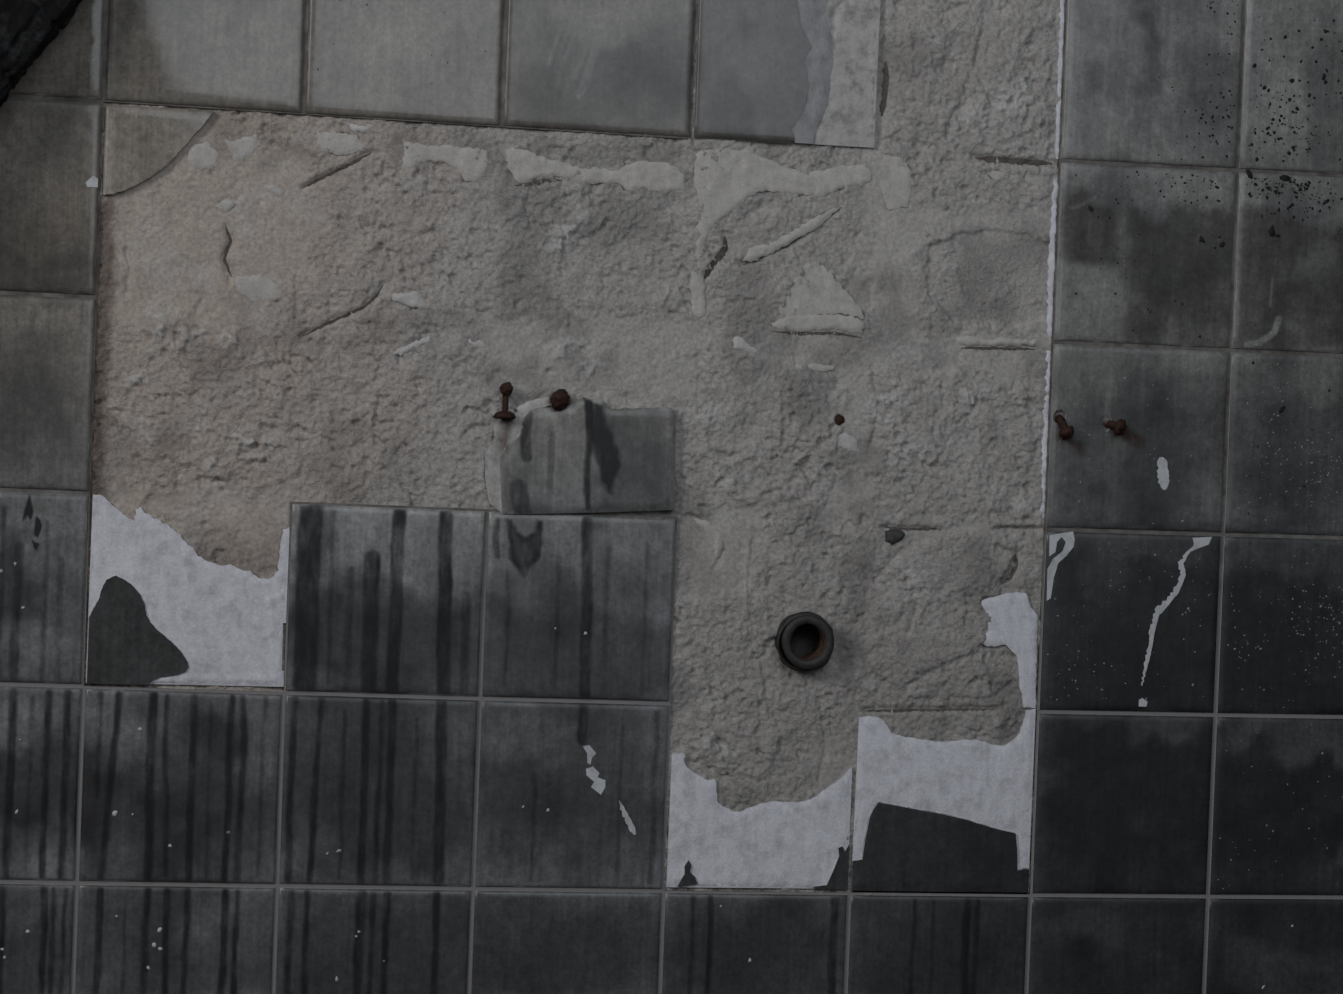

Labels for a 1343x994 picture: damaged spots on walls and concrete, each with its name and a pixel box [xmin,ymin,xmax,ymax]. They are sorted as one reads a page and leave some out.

damp [23,496,41,550]
damp [39,761,67,994]
damp [103,692,121,847]
damp [148,692,167,745]
damp [144,765,186,994]
damp [218,695,246,994]
damp [294,507,322,690]
damp [363,509,406,766]
damp [436,511,452,822]
damp [498,503,542,576]
spalling [84,0,1075,895]
damp [581,399,620,659]